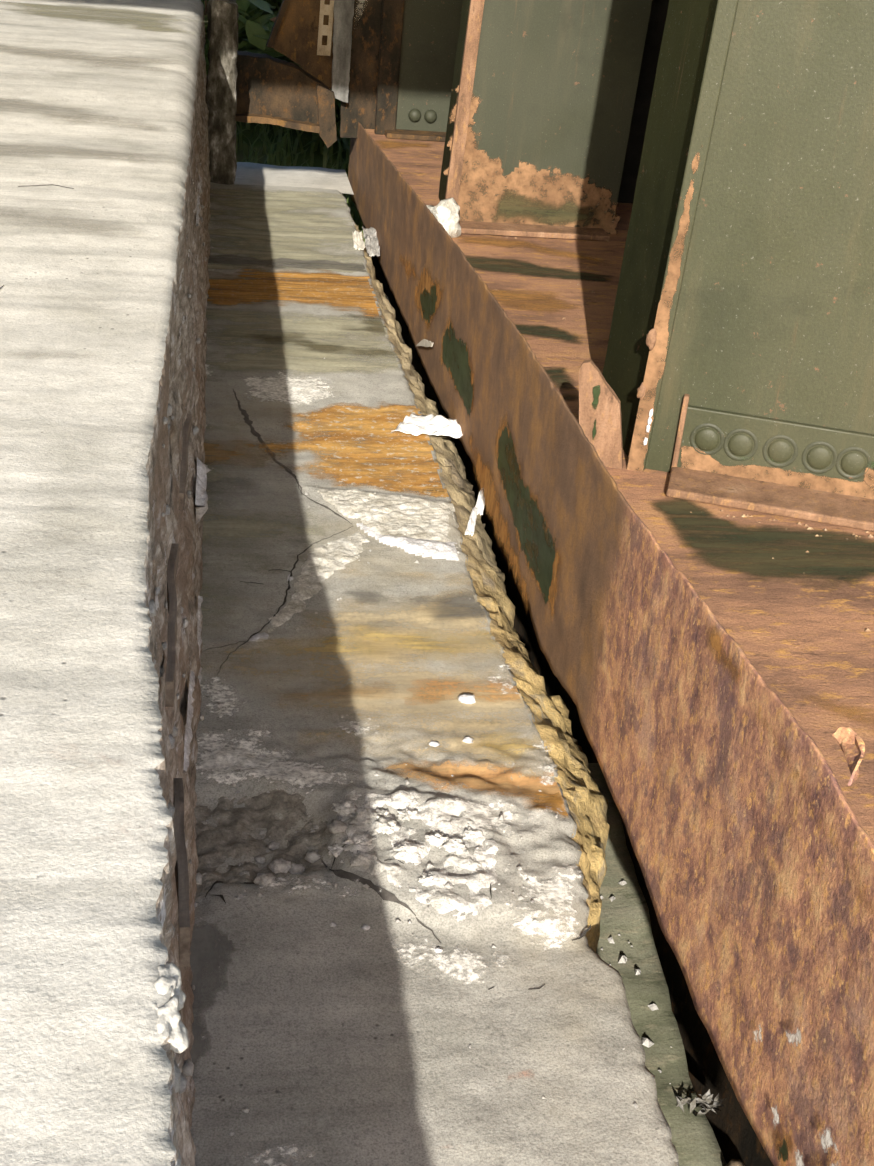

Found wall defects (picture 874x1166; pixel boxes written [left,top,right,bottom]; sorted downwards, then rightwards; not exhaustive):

rust [207,269,380,317]
water stain [206,309,398,405]
spalling [355,224,438,416]
crack [204,389,353,711]
rust [469,416,560,616]
water stain [196,677,354,794]
water stain [227,579,557,785]
spalling [249,435,610,952]
rust [388,761,568,816]
rust [833,727,865,786]
crack [321,844,441,943]
water stain [512,863,581,948]